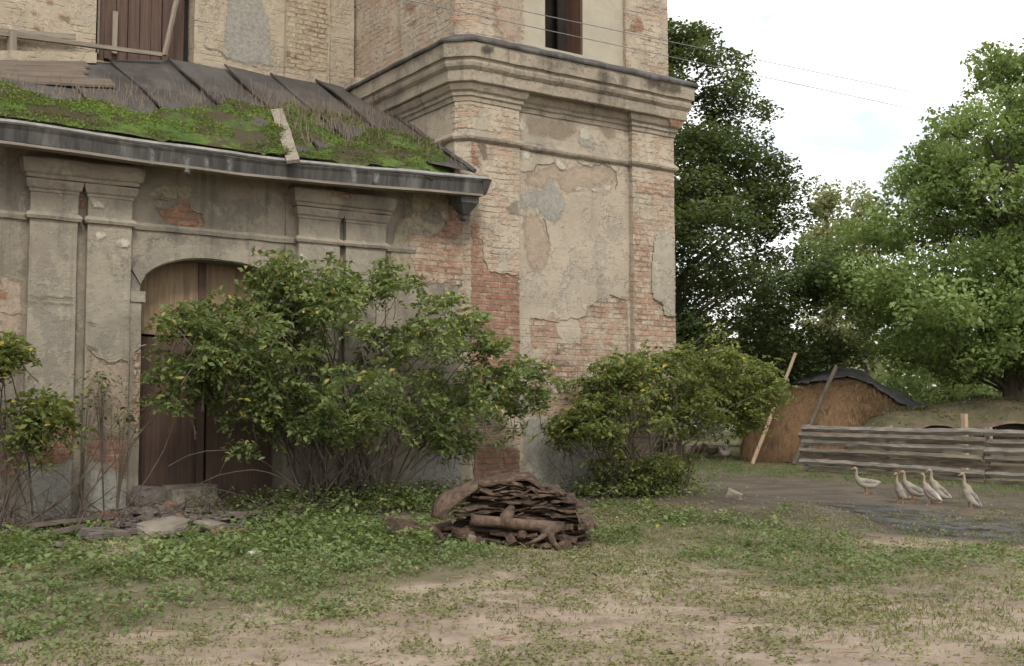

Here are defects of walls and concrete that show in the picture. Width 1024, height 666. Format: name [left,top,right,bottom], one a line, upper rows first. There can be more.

flaking render [149,183,205,228]
flaking render [389,192,676,418]